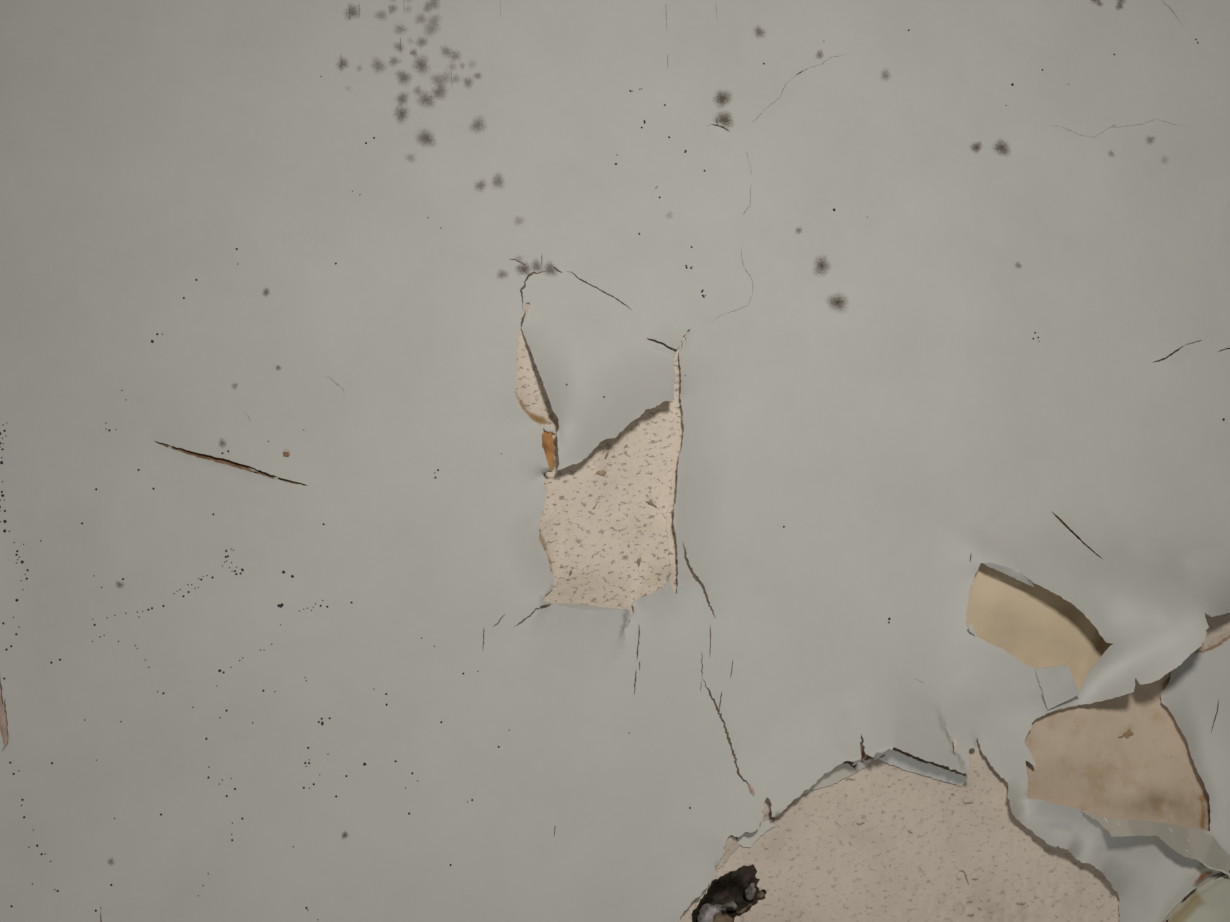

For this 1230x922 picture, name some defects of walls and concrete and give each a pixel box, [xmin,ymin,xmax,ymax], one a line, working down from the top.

crack [510,256,632,328]
peeling [514,282,690,615]
crack [1155,340,1230,362]
crack [683,544,755,796]
peeling [679,563,1230,922]